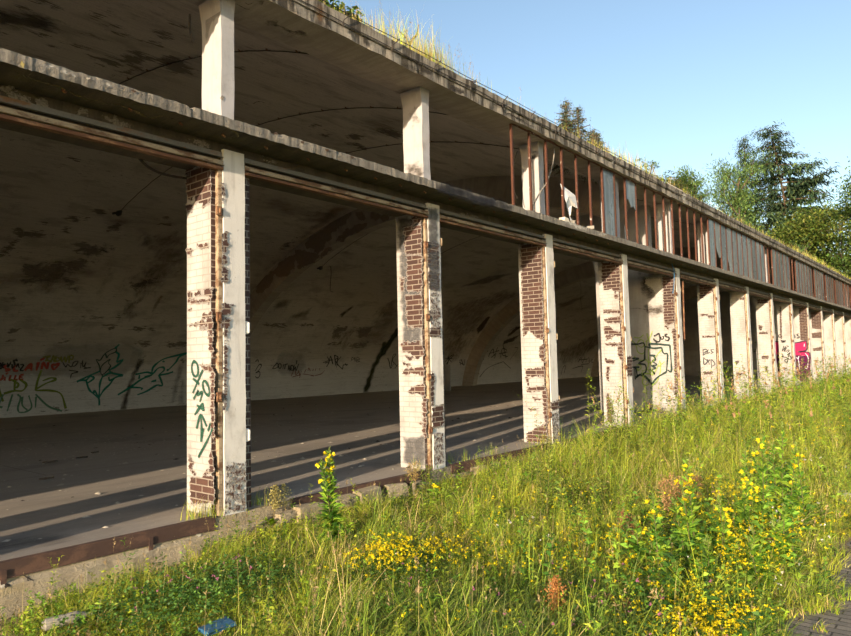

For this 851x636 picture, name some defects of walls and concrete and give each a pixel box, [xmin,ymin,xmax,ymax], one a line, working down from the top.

leakage [0,13,53,38]
peeling [185,167,226,214]
leakage [21,242,114,291]
peeling [186,287,234,506]
peeling [220,231,230,283]
peeling [399,208,441,338]
peeling [400,340,445,466]
peeling [520,243,560,444]
peeling [601,262,633,381]
peeling [225,462,247,514]